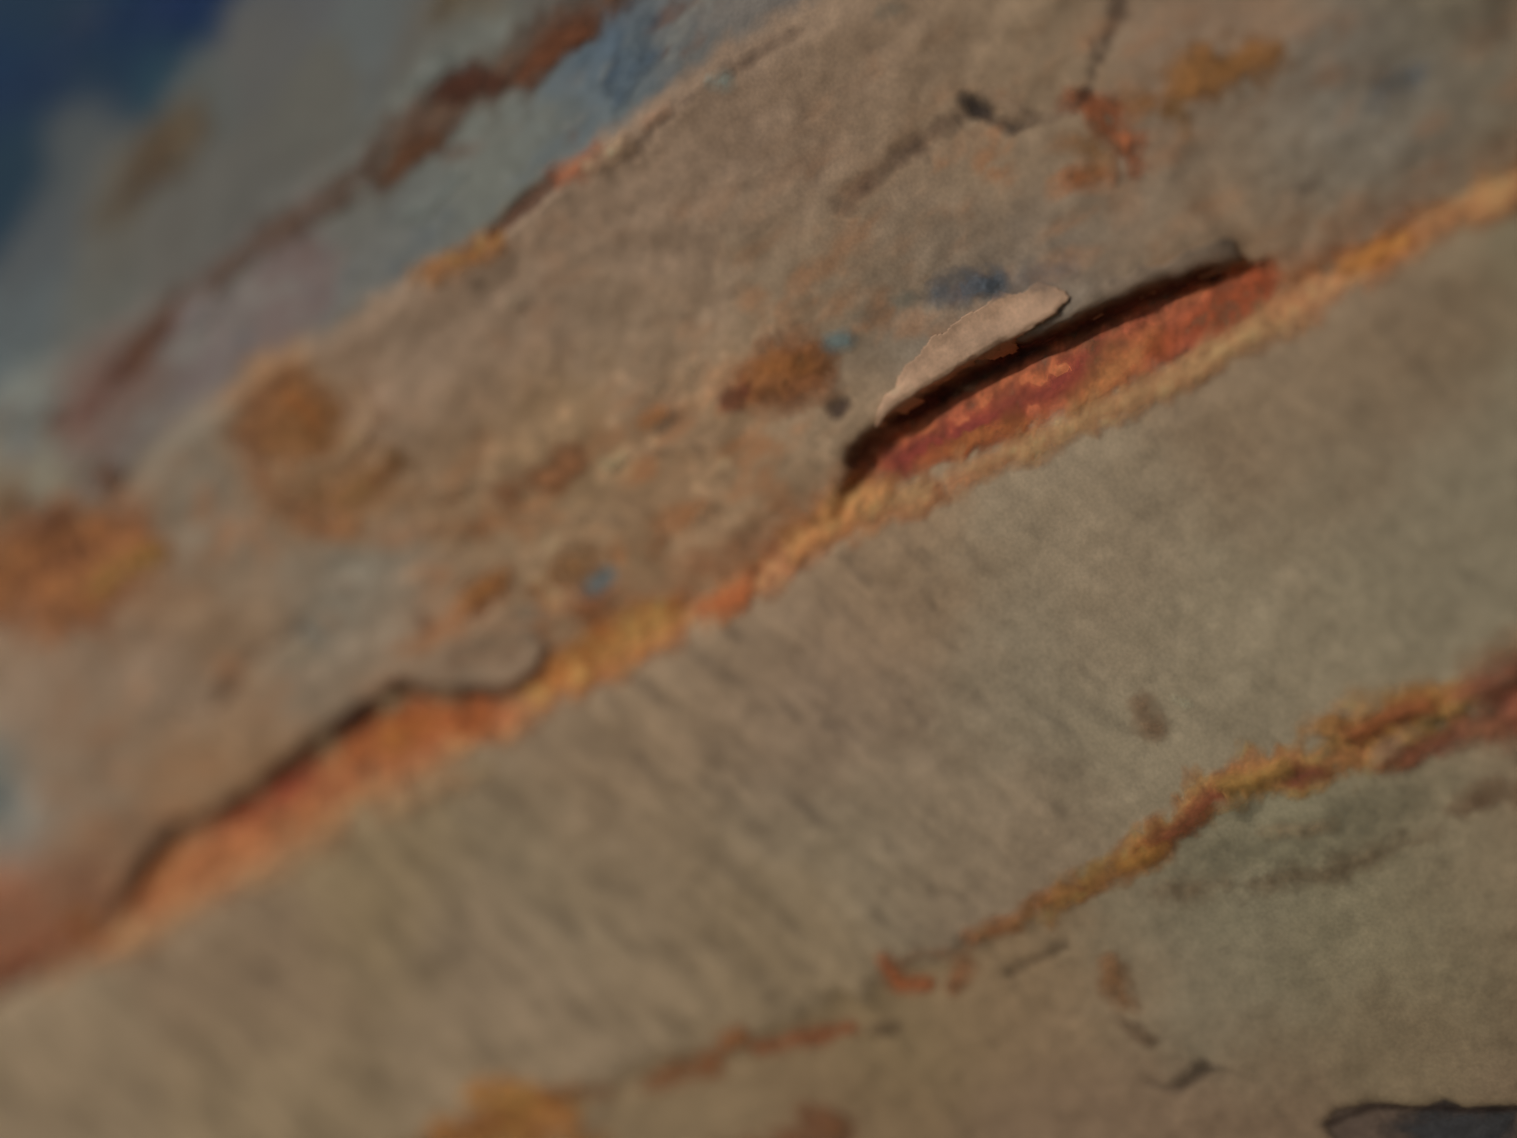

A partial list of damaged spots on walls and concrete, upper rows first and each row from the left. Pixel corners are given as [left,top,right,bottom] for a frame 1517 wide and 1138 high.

rust [1138,41,1282,111]
rust [1068,90,1137,183]
peeling [849,238,1275,479]
rust [47,177,1517,983]
peeling [1325,1101,1517,1138]